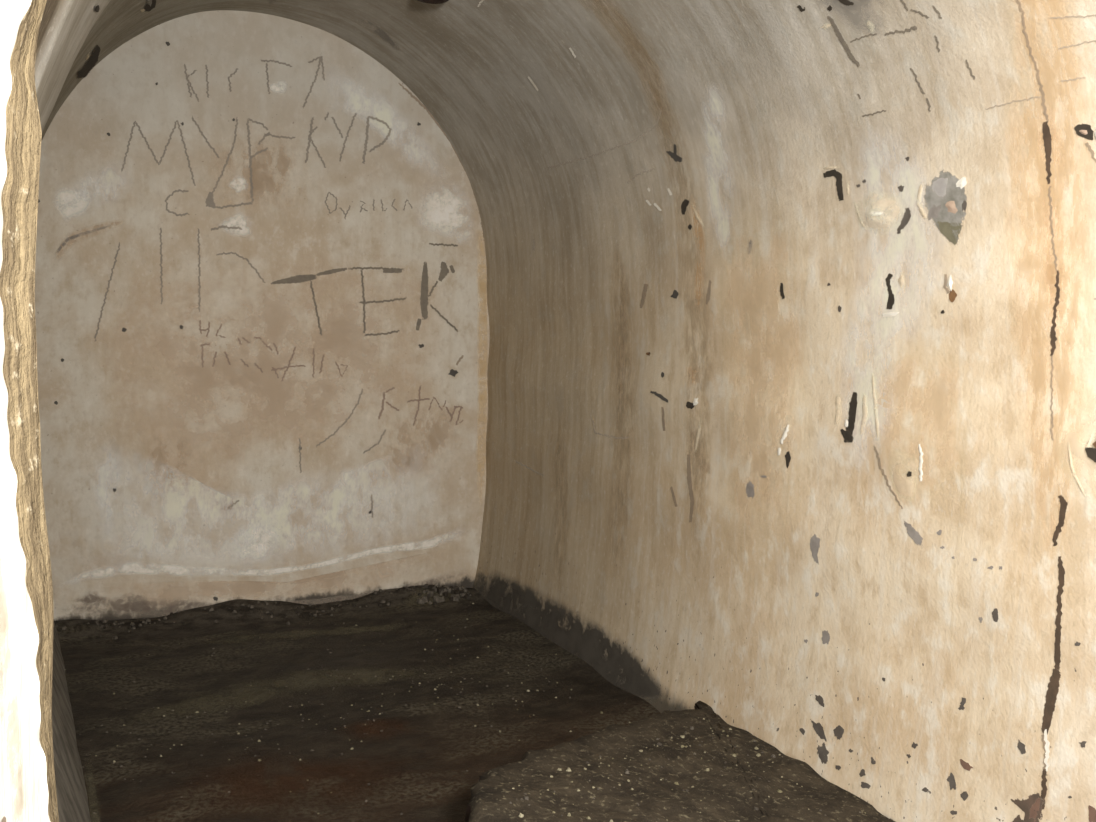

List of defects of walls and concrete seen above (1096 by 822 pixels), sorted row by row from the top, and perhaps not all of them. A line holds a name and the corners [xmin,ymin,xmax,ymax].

water stain [231,146,291,196]
spalling [823,167,848,201]
spalling [918,169,967,245]
crack [1016,0,1060,440]
water stain [180,303,374,422]
spalling [835,378,878,443]
spalling [1085,440,1096,462]
water stain [153,443,290,557]
water stain [80,536,453,615]
crack [1040,495,1068,809]
spalling [1011,792,1044,822]
spalling [1088,805,1096,822]